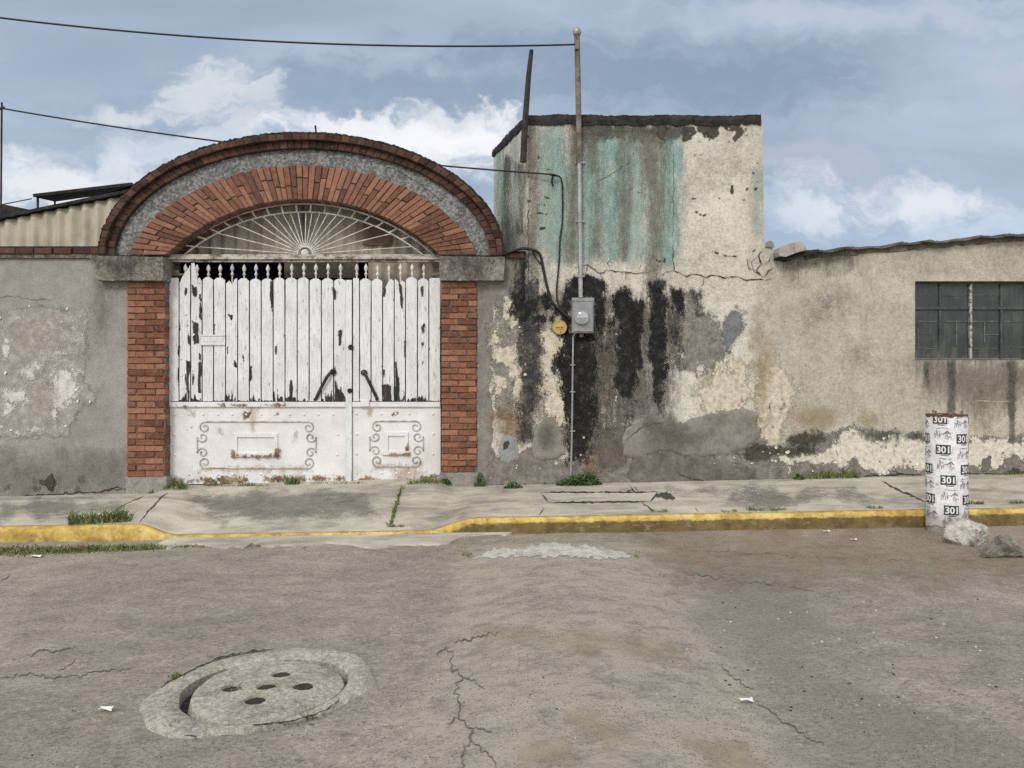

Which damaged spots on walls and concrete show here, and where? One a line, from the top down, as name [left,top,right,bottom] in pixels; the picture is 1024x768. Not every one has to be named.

crack [577,148,772,285]
leakage [496,124,704,468]
peeling [177,281,202,402]
peeling [214,380,308,402]
peeling [322,367,346,402]
peeling [382,341,439,402]
flaking render [476,256,634,486]
peeling [667,289,925,480]
leakage [923,358,1024,440]
rust [172,474,248,484]
rust [230,448,281,459]
rust [263,475,346,483]